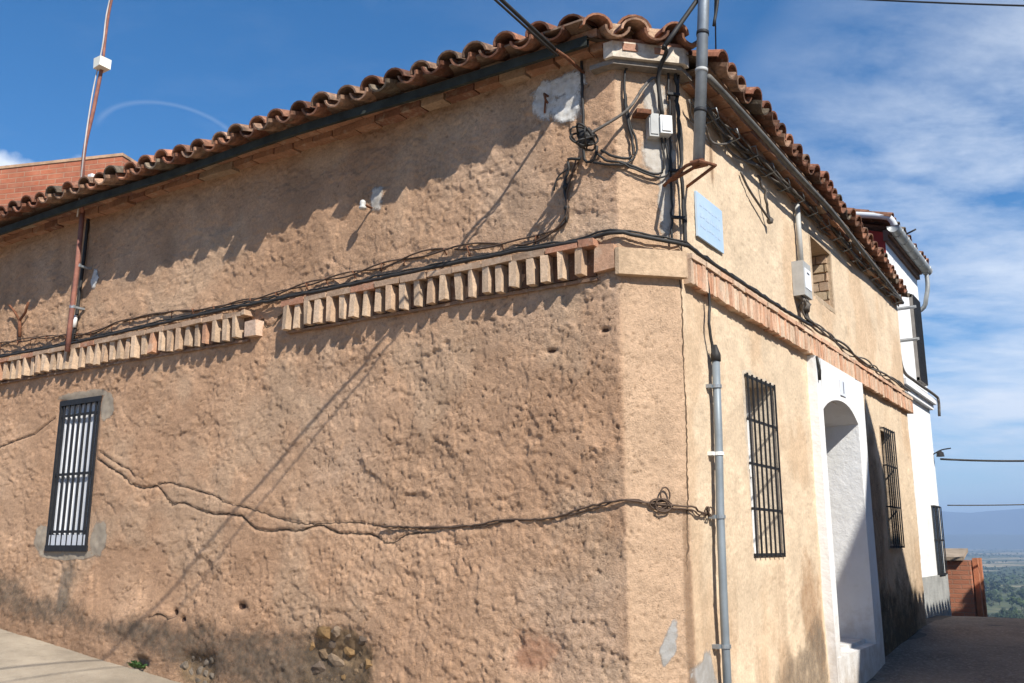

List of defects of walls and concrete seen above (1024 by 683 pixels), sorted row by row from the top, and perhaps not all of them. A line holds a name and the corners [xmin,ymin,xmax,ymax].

crack [98,452,443,544]
spalling [304,625,372,683]